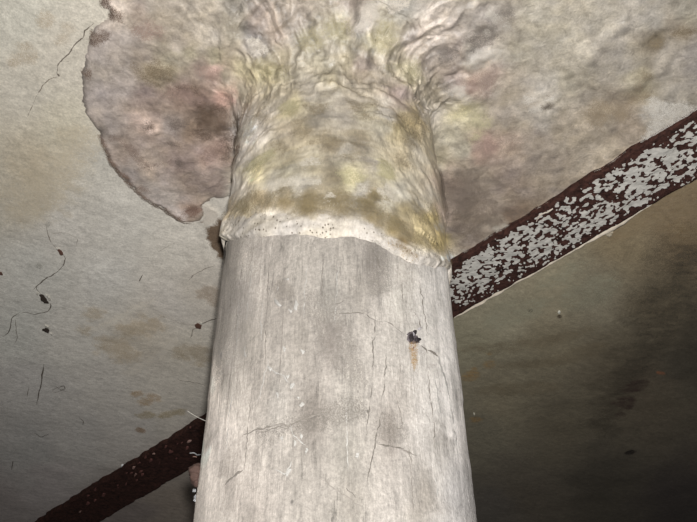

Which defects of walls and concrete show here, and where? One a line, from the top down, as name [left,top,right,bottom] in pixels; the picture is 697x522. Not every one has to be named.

crack [28,23,94,115]
water stain [88,27,112,47]
water stain [99,0,126,24]
water stain [130,54,260,169]
water stain [0,121,189,230]
water stain [263,156,338,206]
peeling [200,121,697,318]
crack [4,227,78,344]
crack [337,300,404,481]